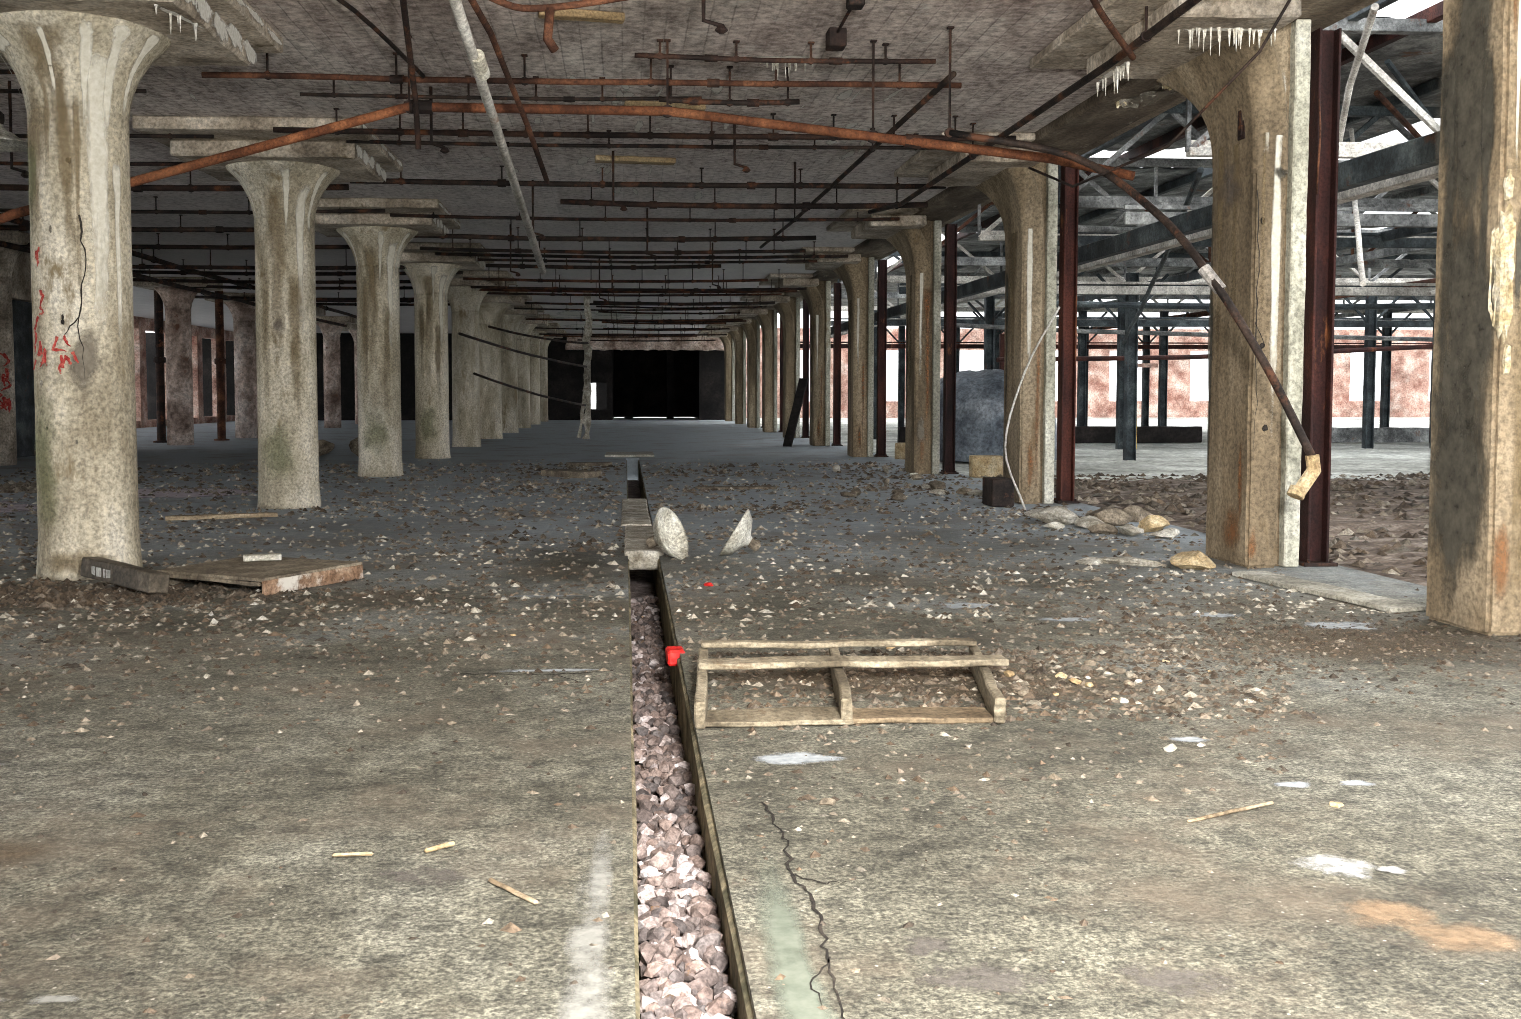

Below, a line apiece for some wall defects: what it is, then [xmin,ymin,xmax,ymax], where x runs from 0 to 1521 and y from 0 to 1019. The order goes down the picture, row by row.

leakage [1177,27,1277,56]
crack [761,801,848,1019]